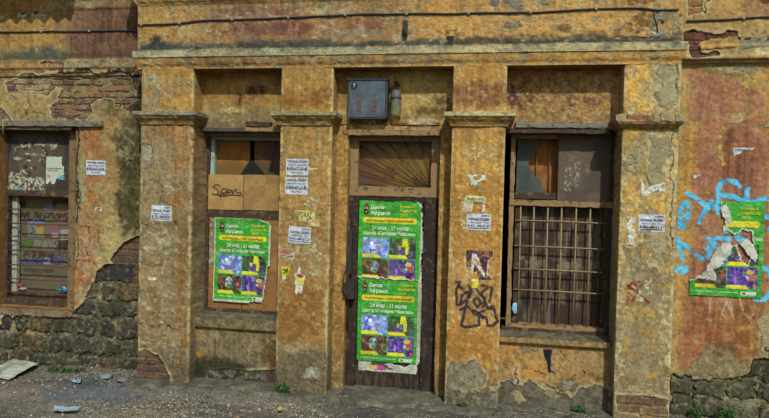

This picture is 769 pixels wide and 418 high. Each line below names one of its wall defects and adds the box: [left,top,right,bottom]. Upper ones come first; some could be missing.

flaking render [614,0,769,90]
flaking render [6,60,138,121]
peeling [507,64,684,124]
peeling [624,134,674,192]
peeling [717,112,747,167]
peeling [445,209,769,418]
flaking render [137,350,170,381]